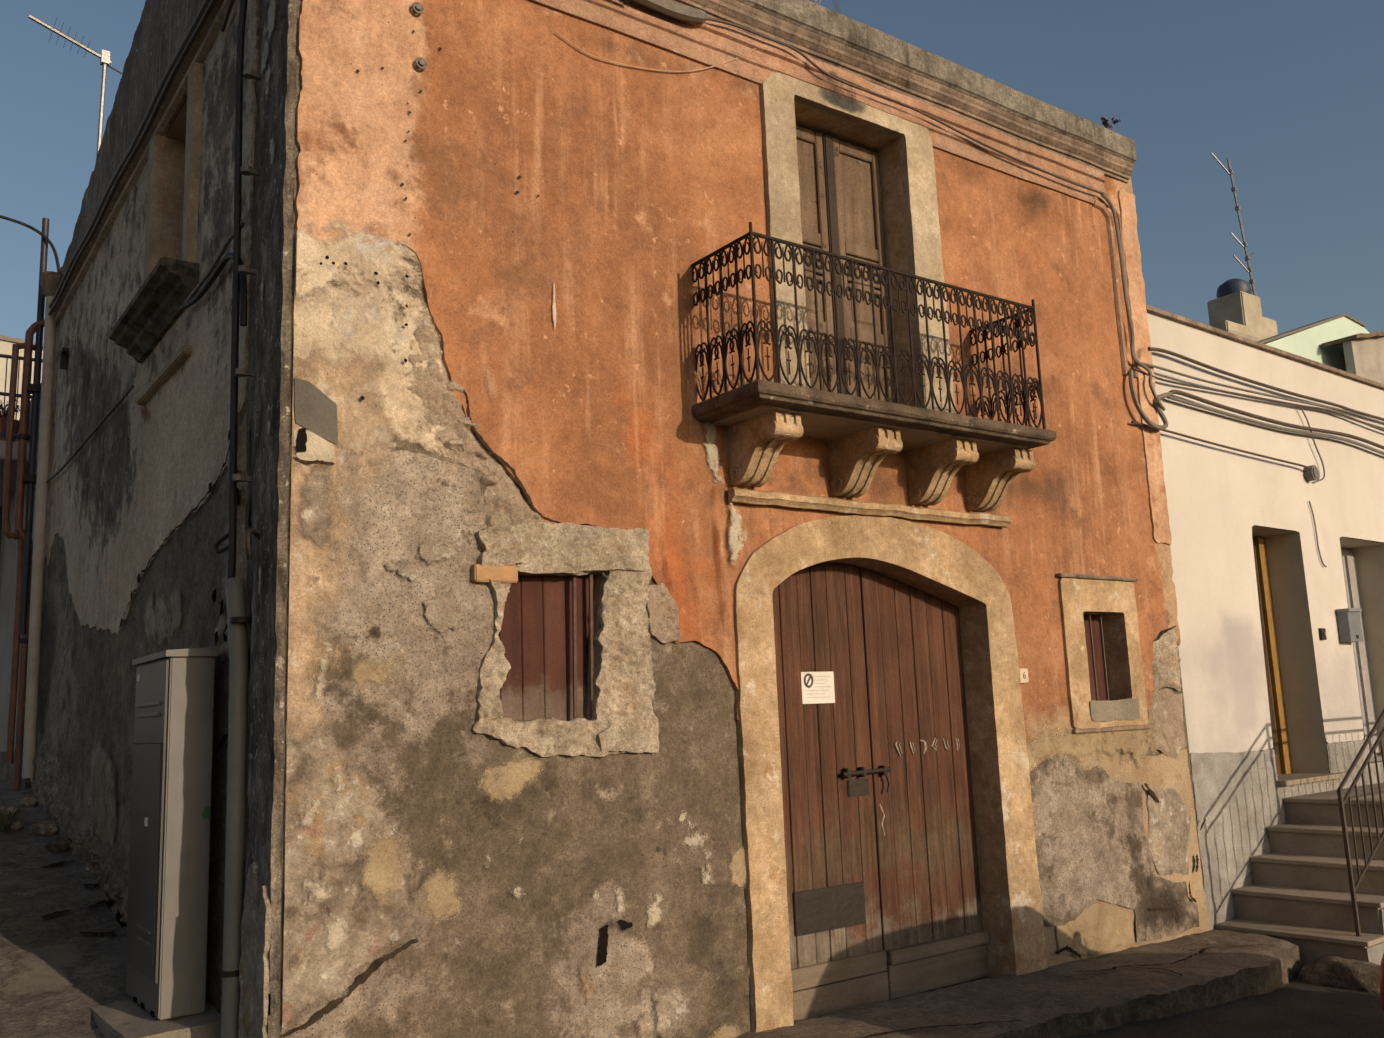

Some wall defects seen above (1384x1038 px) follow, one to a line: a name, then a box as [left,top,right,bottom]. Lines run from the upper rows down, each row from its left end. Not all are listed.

peeling [261,0,276,102]
peeling [36,217,751,1038]
peeling [1026,625,1209,966]